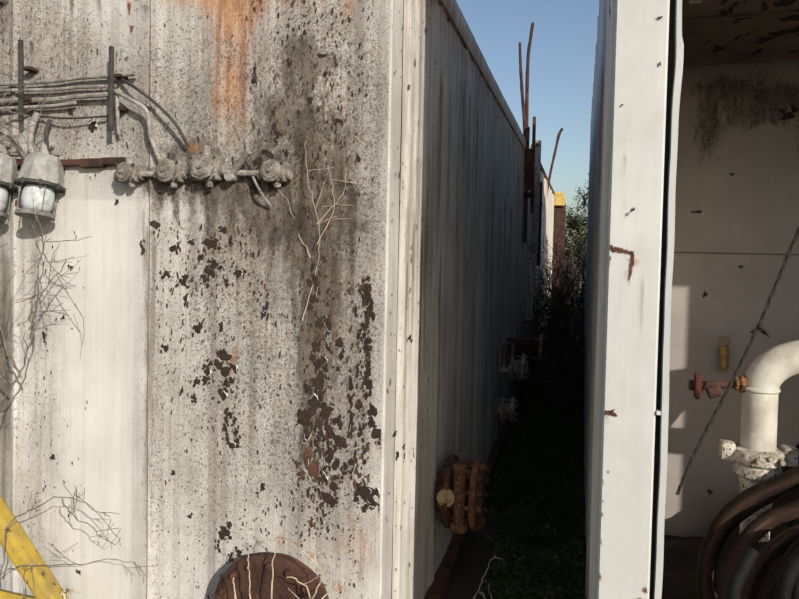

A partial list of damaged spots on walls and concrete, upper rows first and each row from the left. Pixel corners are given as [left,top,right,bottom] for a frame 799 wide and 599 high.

peeling [61,103,113,149]
peeling [702,0,799,55]
peeling [150,0,390,588]
leakage [271,134,346,356]